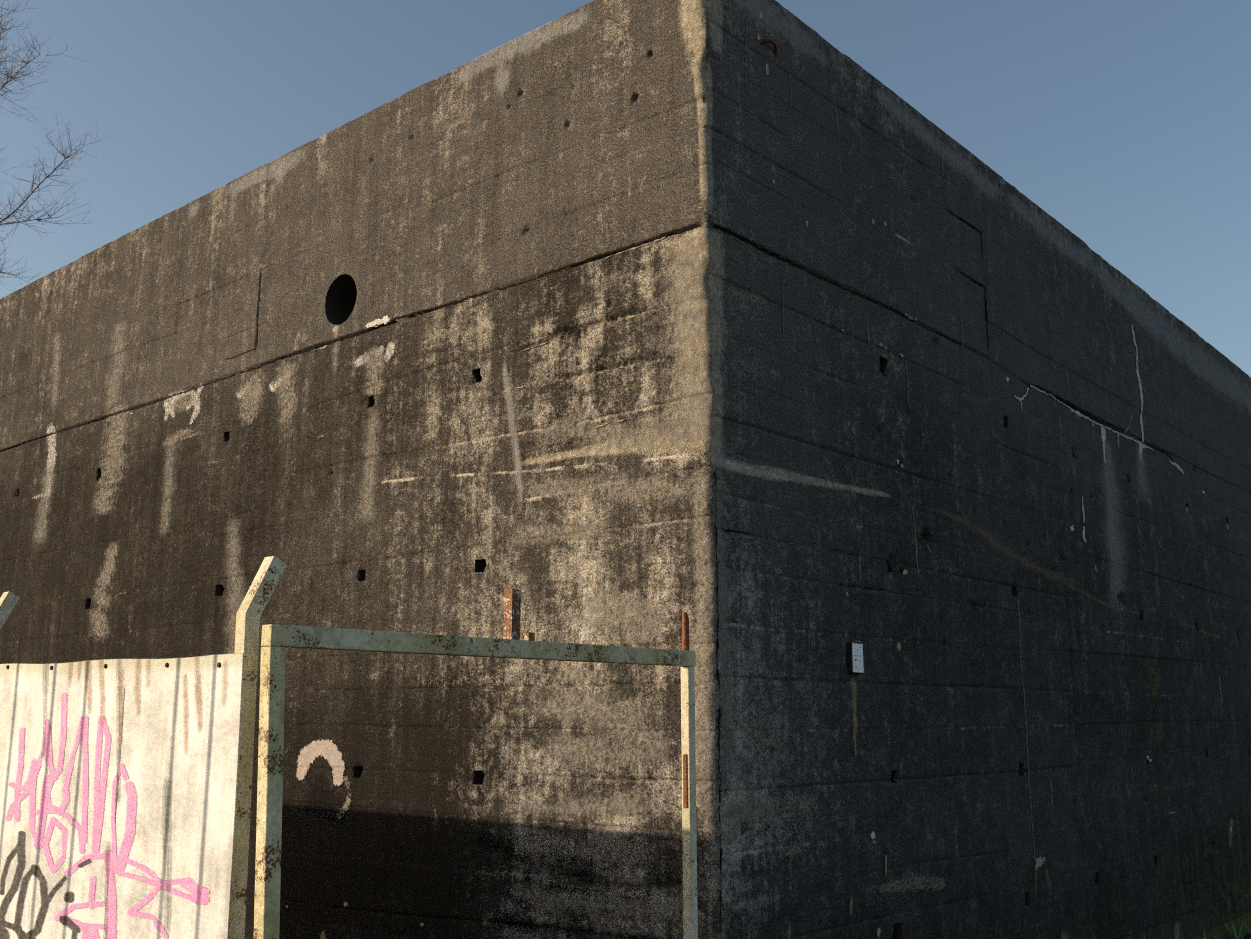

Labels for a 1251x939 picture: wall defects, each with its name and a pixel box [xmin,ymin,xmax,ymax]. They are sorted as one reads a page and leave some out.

leakage [34,426,57,540]
leakage [95,323,128,514]
leakage [161,383,203,529]
leakage [236,362,297,424]
leakage [364,417,378,519]
leakage [355,342,395,395]
crack [1014,325,1184,474]
leakage [91,544,118,636]
leakage [229,525,240,653]